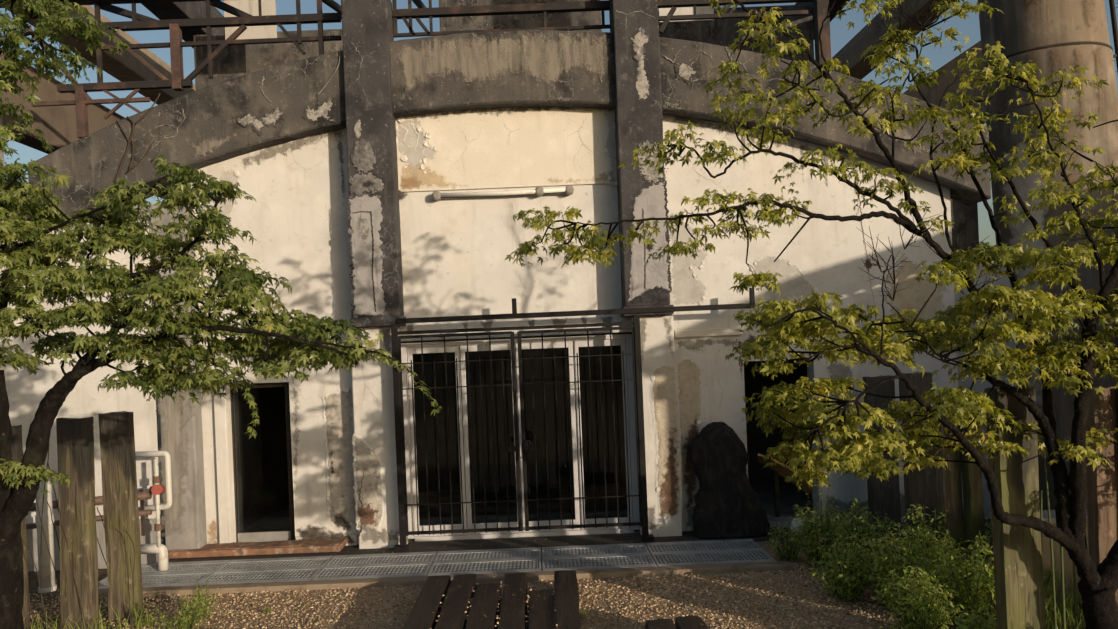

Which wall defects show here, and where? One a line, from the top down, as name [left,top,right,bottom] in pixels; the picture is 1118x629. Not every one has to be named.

water stain [400,34,606,88]
peeling [629,24,655,103]
peeling [236,105,285,135]
peeling [302,96,336,125]
water stain [398,166,447,199]
peeling [626,140,709,306]
flaking render [321,383,384,536]
flaking render [650,356,704,521]